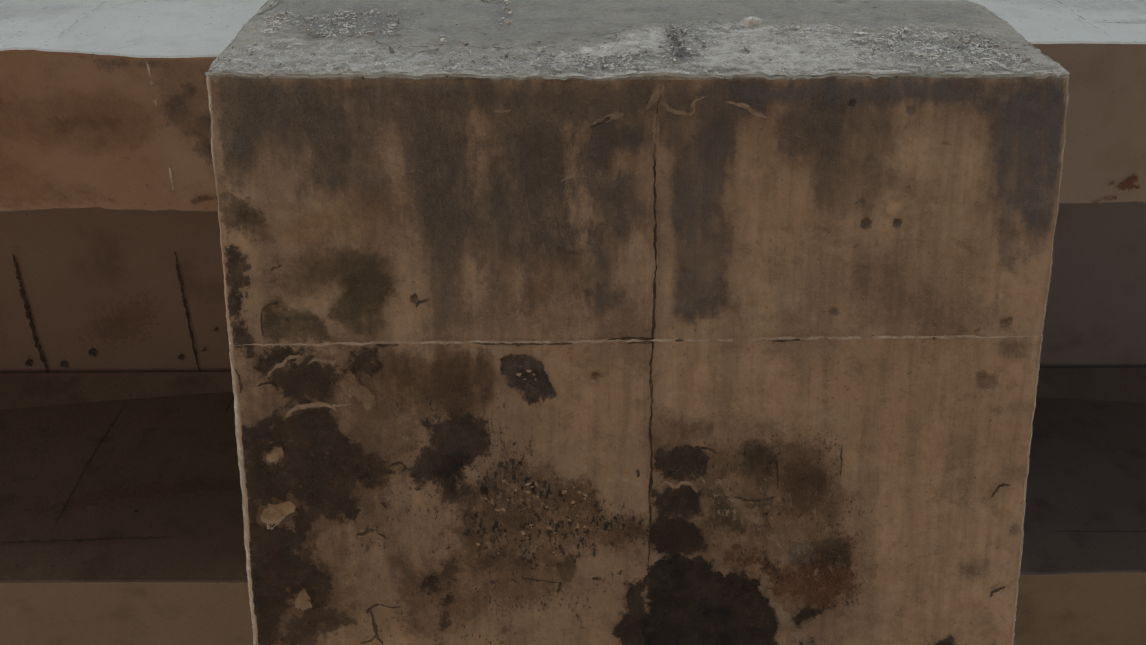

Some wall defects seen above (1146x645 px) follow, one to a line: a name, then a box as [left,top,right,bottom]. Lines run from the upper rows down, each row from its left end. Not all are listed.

damp [197,28,670,176]
damp [571,19,1064,322]
damp [224,245,601,645]
damp [353,434,862,645]
damp [935,636,955,645]